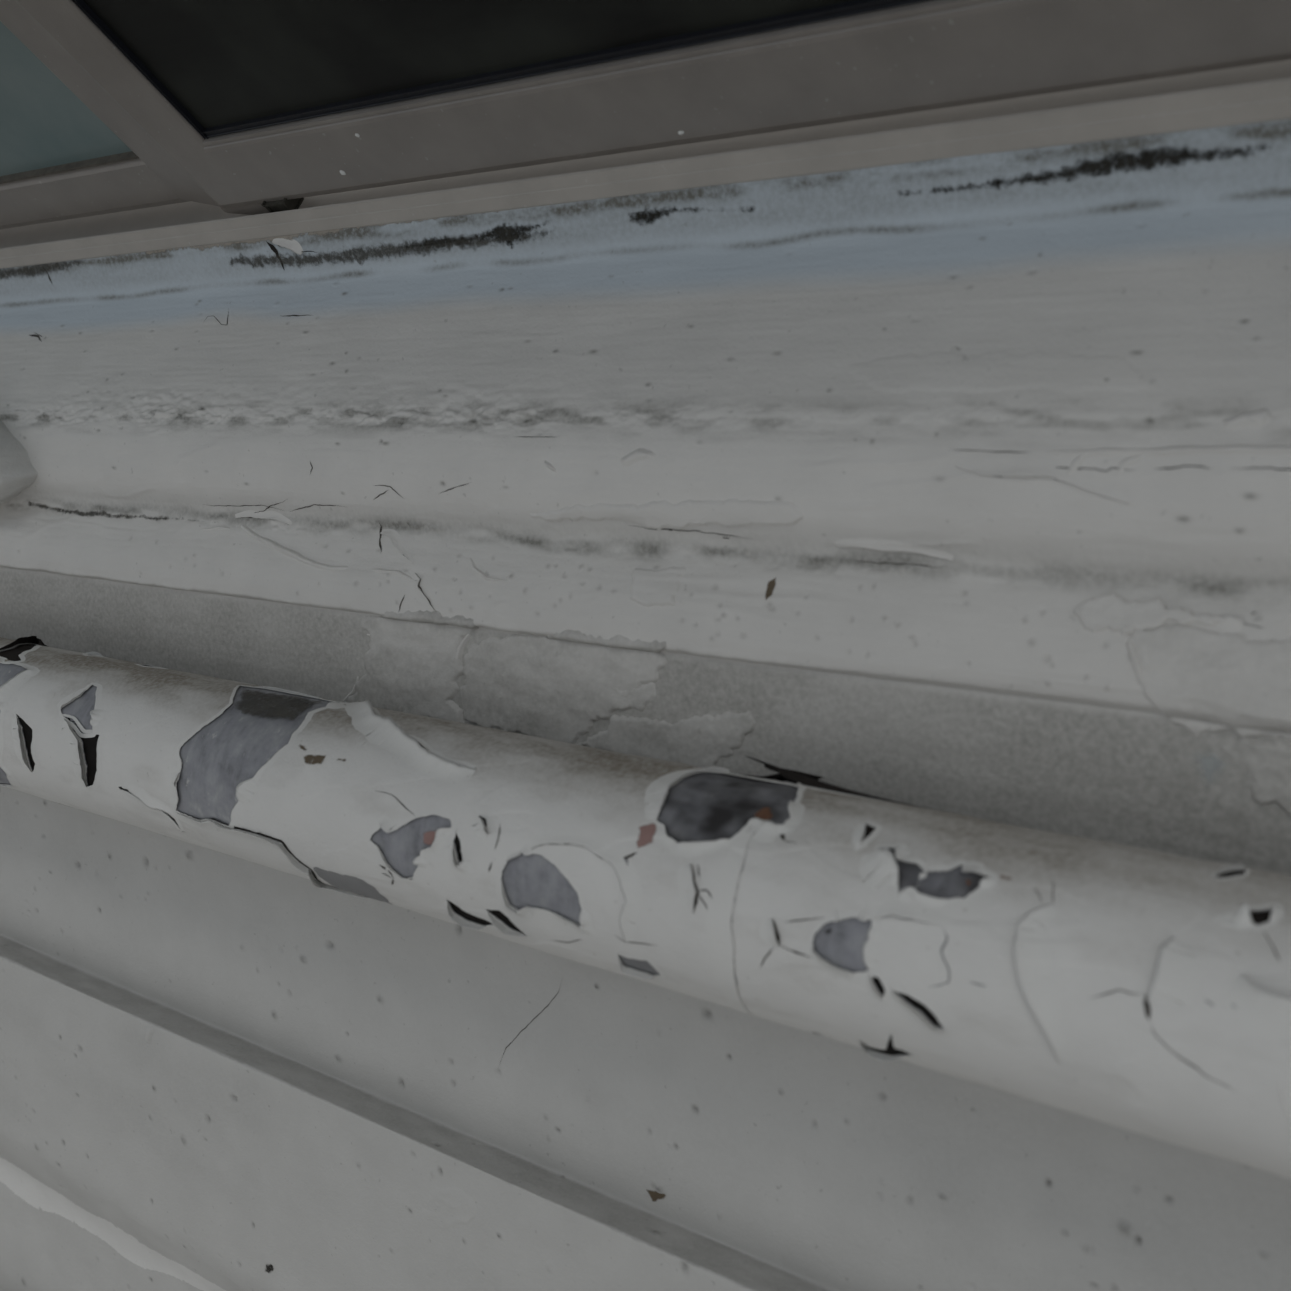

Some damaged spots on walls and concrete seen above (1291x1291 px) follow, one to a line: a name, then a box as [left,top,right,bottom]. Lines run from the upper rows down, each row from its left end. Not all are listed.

damp [988,146,1265,189]
damp [230,224,544,268]
peeling [0,656,40,789]
peeling [57,682,108,738]
peeling [168,685,476,830]
peeling [367,810,457,882]
peeling [496,844,598,939]
peeling [806,843,999,982]
peeling [1213,902,1284,931]